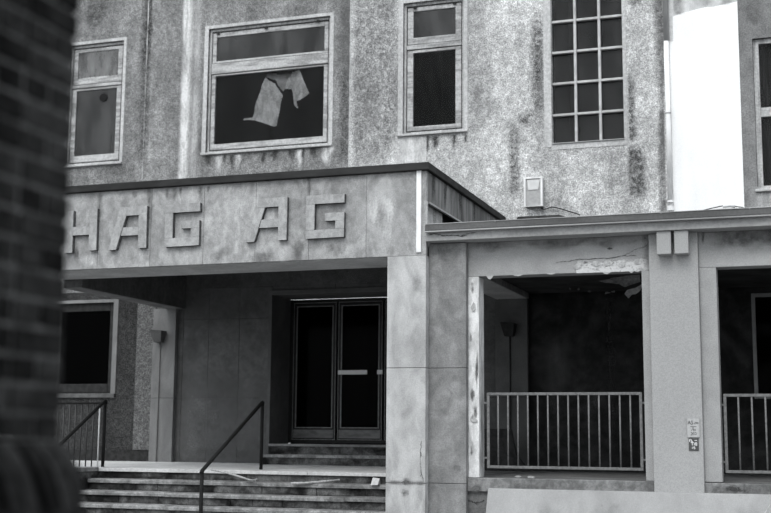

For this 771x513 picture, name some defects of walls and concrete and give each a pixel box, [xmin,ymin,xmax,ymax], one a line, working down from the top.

leakage [519,21,542,124]
spalling [574,259,648,298]